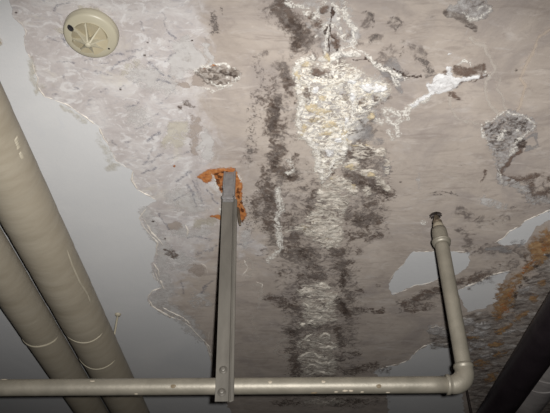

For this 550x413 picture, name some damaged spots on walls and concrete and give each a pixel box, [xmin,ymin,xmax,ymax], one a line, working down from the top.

crack [324,7,338,56]
spalling [443,0,493,23]
spalling [195,62,242,89]
spalling [480,109,537,171]
rust [197,167,247,222]
water stain [241,0,430,377]
rust [492,230,550,320]
peeling [226,391,390,413]